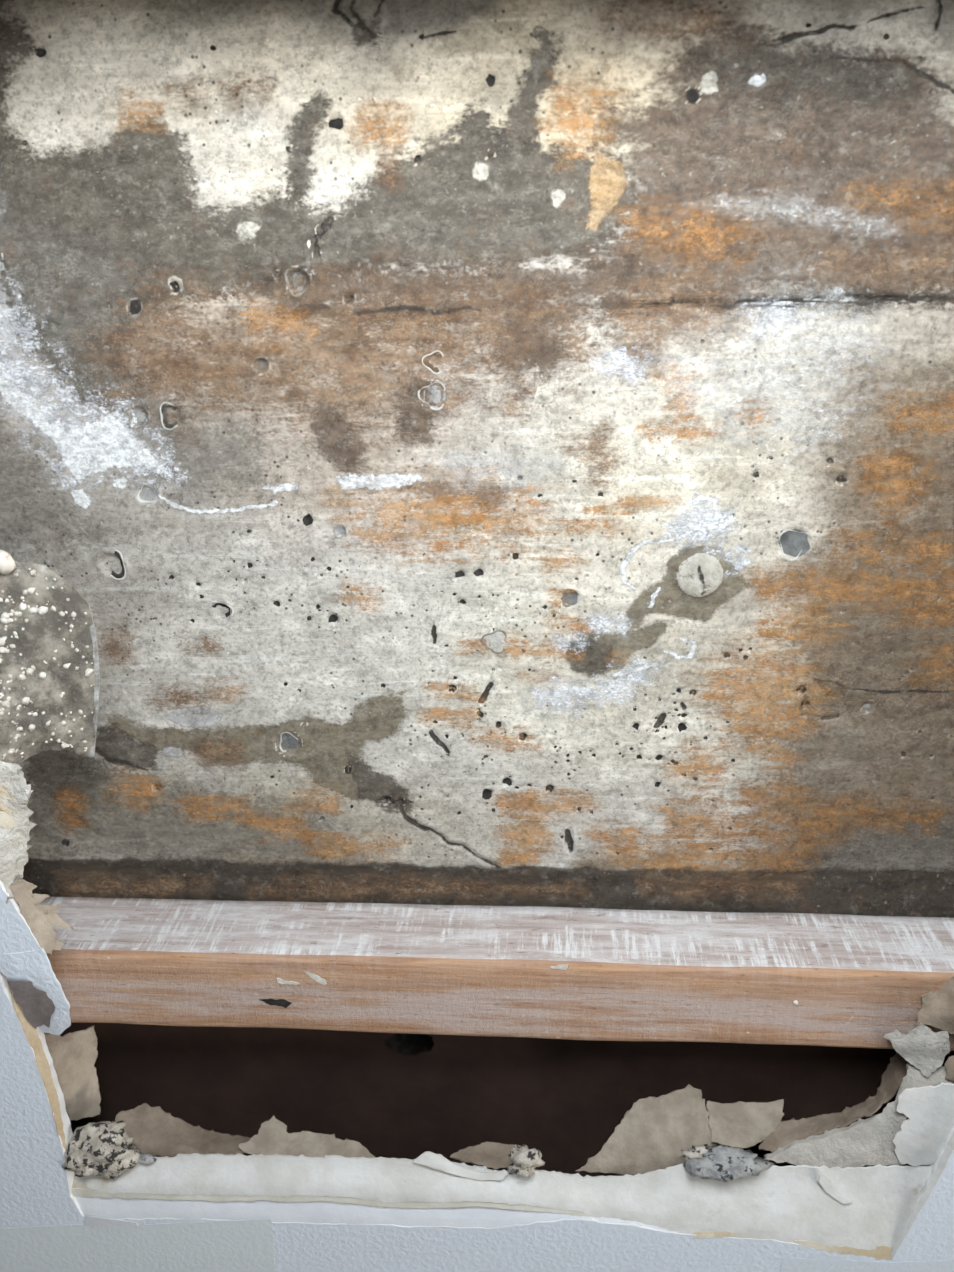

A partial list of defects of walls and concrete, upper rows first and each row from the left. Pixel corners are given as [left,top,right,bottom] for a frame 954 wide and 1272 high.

crack [331,0,385,34]
crack [418,31,457,39]
crack [751,6,954,93]
leakage [0,0,954,559]
corrosion [564,420,618,487]
leakage [519,493,751,717]
corrosion [151,680,244,714]
corrosion [419,683,535,752]
corrosion [174,790,402,862]
crack [375,796,500,868]
leakage [22,690,954,918]
corrosion [494,789,596,868]